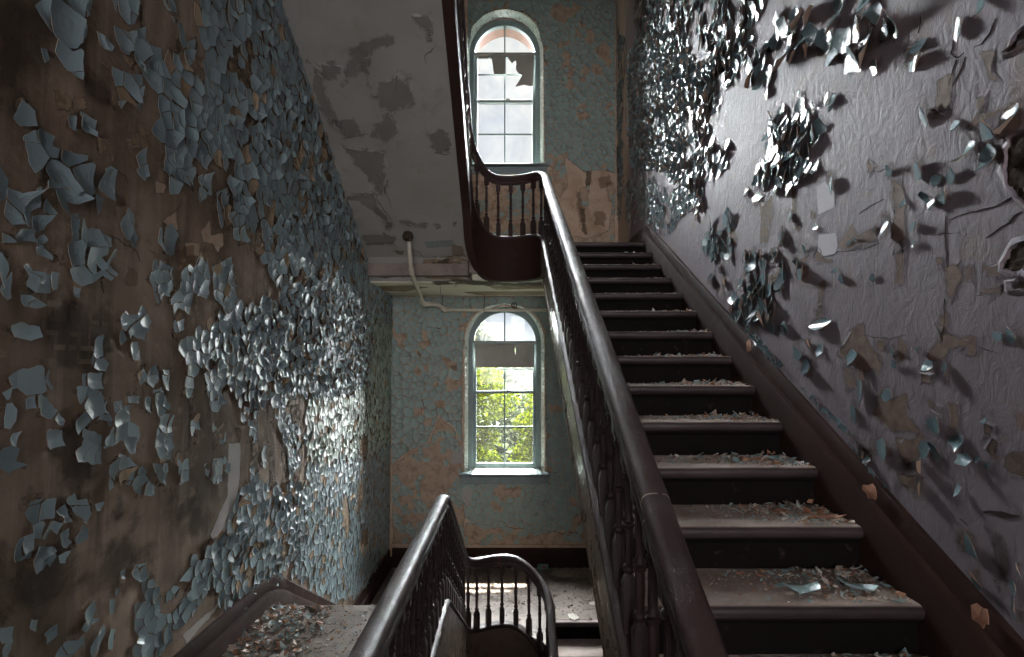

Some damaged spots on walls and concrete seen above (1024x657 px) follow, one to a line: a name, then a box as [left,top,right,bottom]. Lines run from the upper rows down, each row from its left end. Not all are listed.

peeling [0,95,118,308]
peeling [467,0,916,369]
peeling [902,37,929,73]
spalling [913,23,1024,210]
peeling [0,305,189,574]
peeling [29,0,585,657]
flaking render [793,235,1024,497]
spalling [983,510,1020,518]
peeling [0,627,14,657]